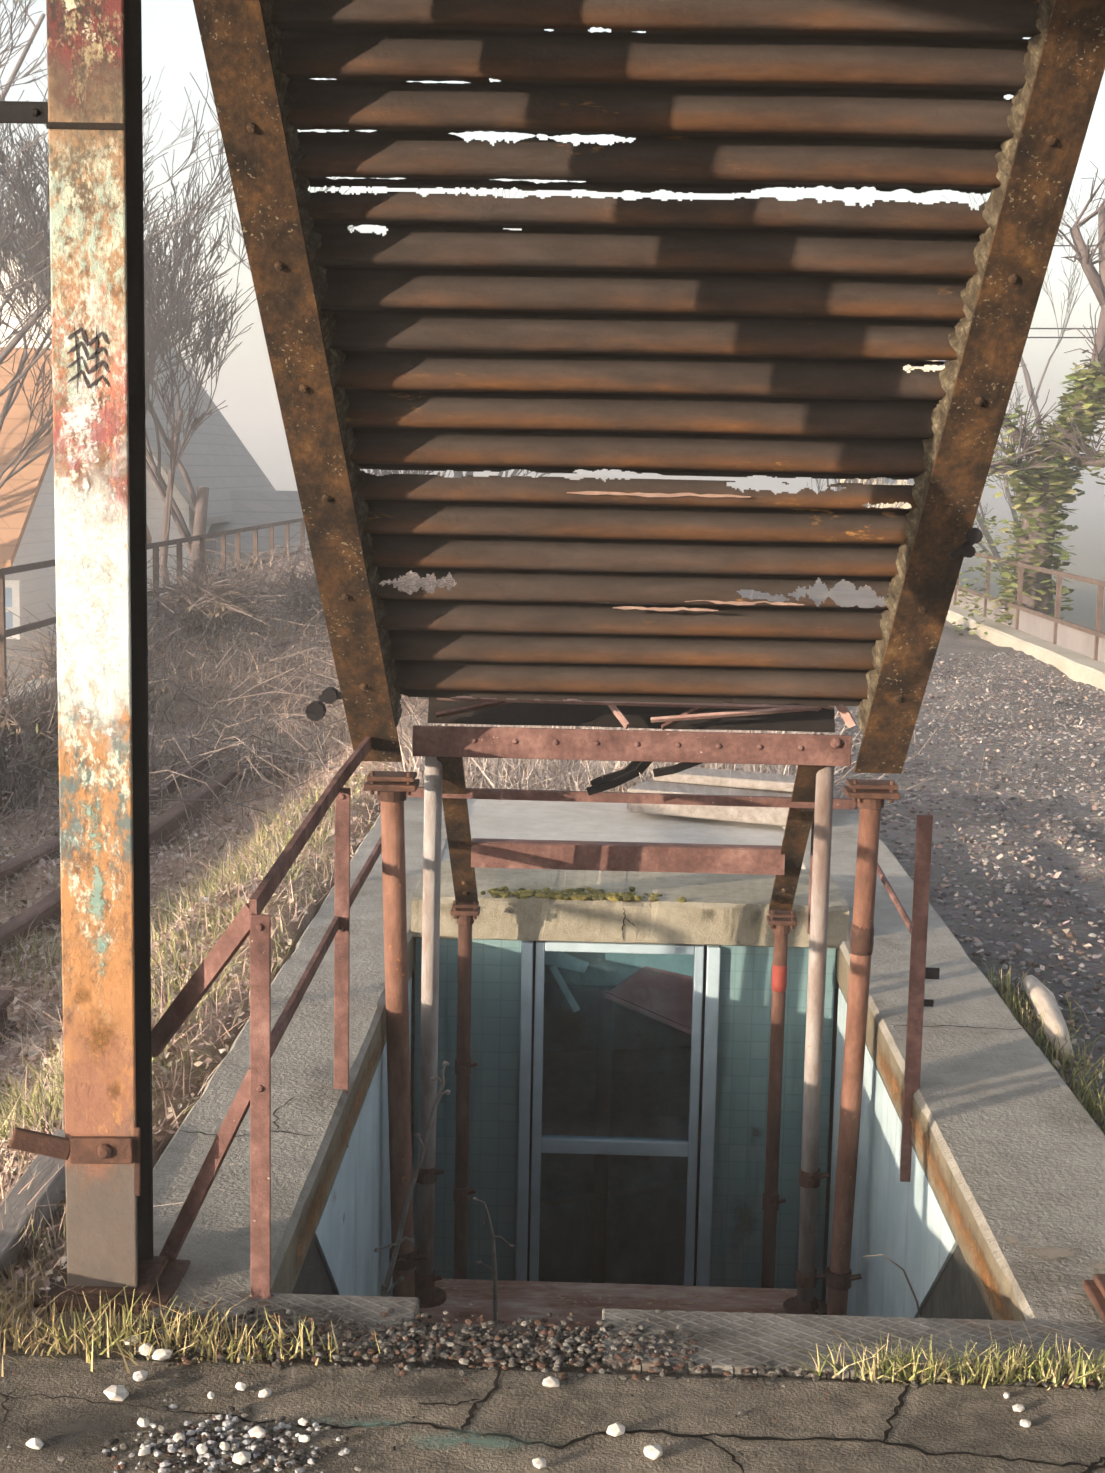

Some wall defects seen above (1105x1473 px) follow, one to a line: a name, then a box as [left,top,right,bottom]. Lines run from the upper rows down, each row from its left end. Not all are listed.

peeling [64,0,96,41]
corrosion [296,1035,384,1268]
crack [0,1366,1105,1473]